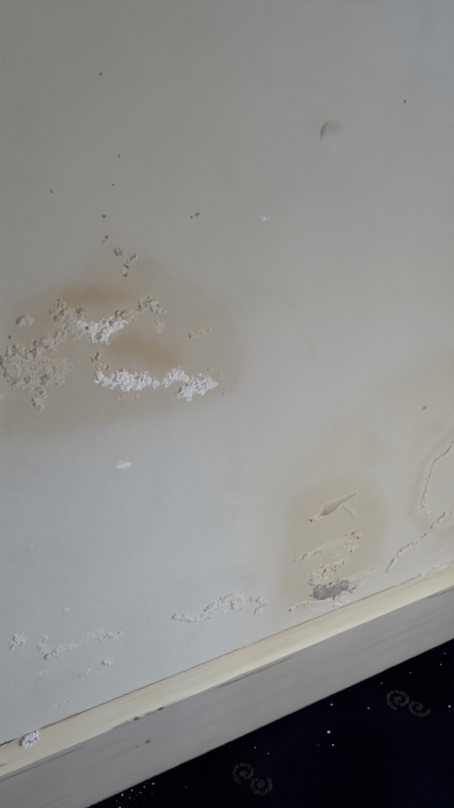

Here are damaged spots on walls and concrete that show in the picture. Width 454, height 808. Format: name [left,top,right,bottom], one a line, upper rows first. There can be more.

peeling [0,295,227,413]
peeling [288,440,454,613]
peeling [172,589,269,624]